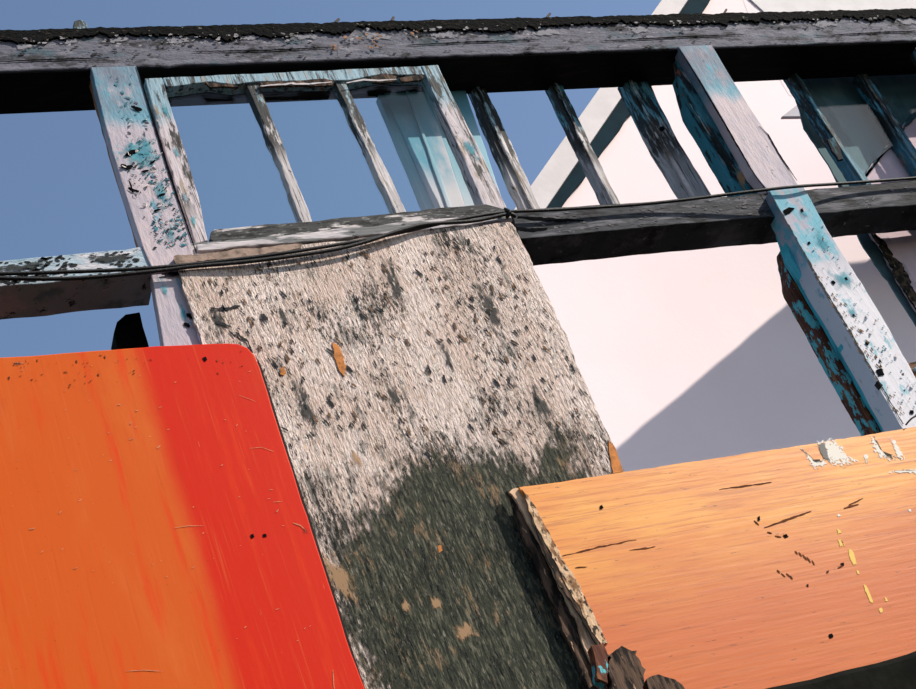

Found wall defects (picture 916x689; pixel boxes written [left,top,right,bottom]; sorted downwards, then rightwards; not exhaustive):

peeling [126,134,195,249]
peeling [0,255,78,284]
peeling [90,251,139,275]
peeling [806,220,916,415]
peeling [800,436,916,474]
water stain [324,385,600,689]